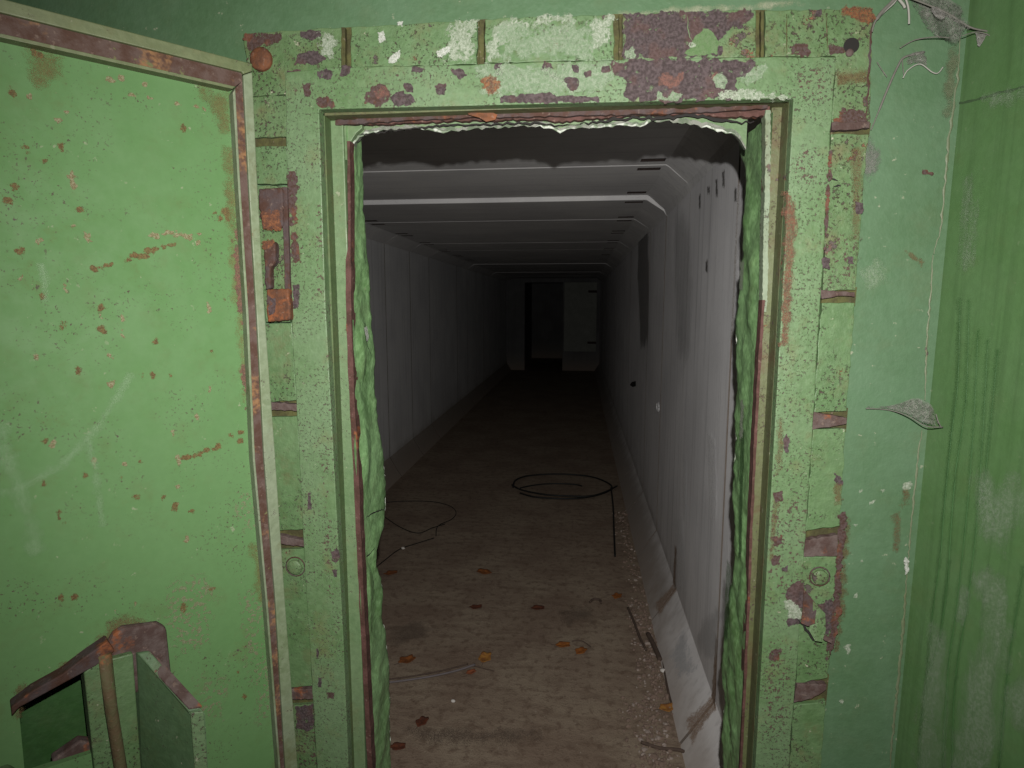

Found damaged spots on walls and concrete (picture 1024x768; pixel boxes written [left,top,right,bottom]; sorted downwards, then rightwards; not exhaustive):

corrosion [242,32,282,60]
peeling [436,18,480,63]
corrosion [287,8,768,126]
corrosion [786,14,811,58]
corrosion [816,9,845,55]
corrosion [833,4,876,123]
spalling [589,119,657,128]
corrosion [261,171,301,263]
corrosion [90,230,202,272]
corrosion [777,191,798,348]
corrosion [825,473,851,661]